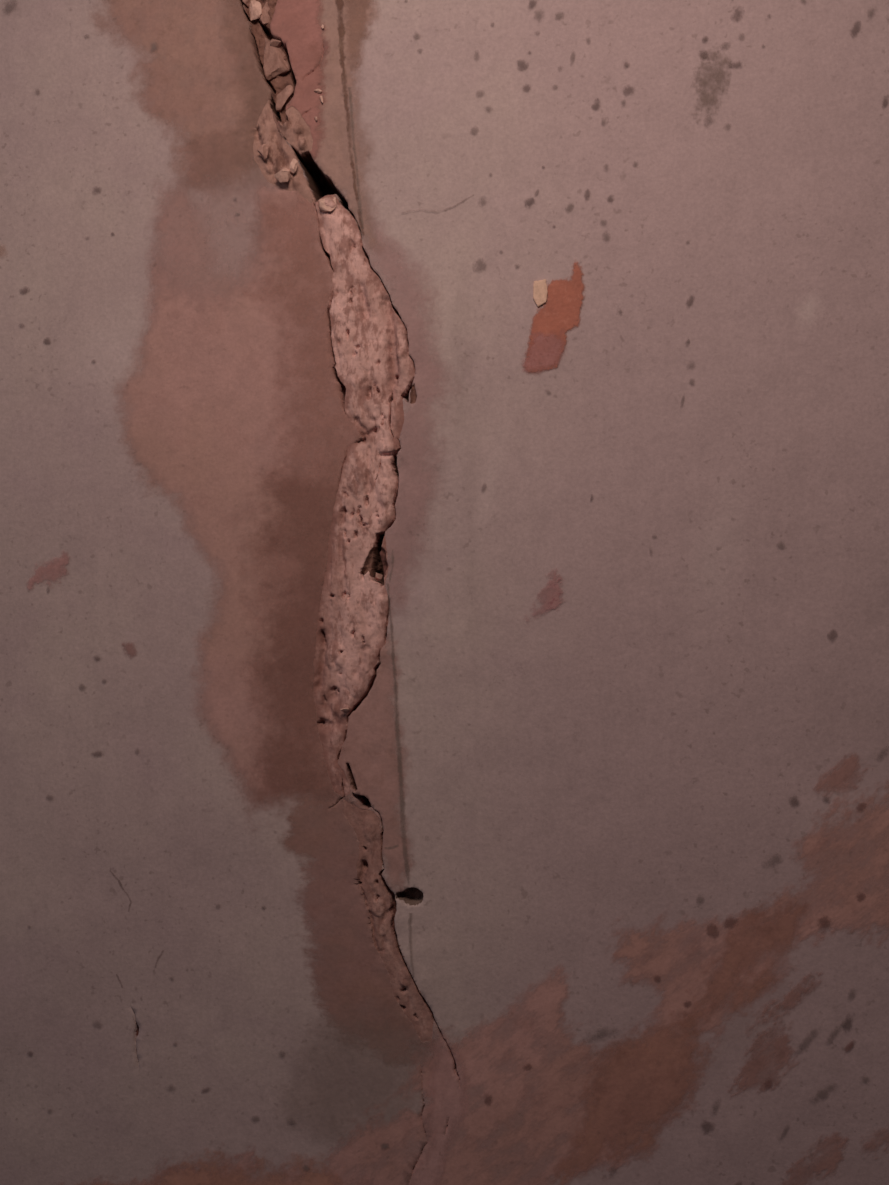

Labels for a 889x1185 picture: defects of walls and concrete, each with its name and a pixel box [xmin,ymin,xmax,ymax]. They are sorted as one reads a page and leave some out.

crack [241,0,356,219]
peeling [523,262,585,373]
crack [333,367,346,403]
crack [390,383,417,426]
leakage [110,0,440,1064]
crack [361,456,399,584]
crack [355,664,380,710]
crack [339,754,370,805]
crack [381,863,399,947]